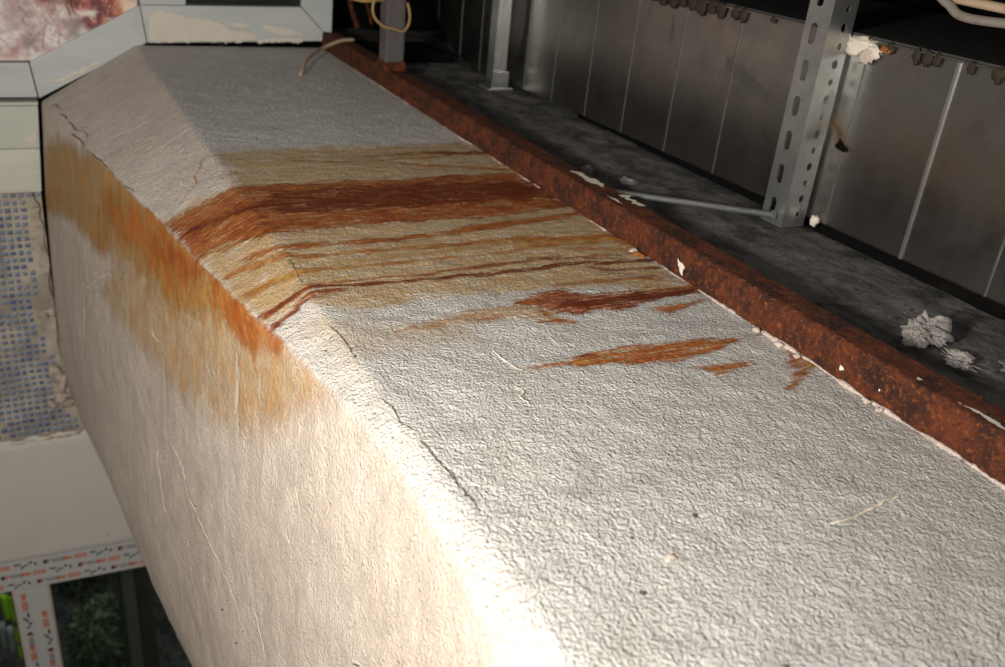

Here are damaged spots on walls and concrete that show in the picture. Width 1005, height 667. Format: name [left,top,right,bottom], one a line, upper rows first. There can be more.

peeling [147,9,303,44]
crack [52,104,106,166]
rust [165,143,700,331]
rust [533,338,754,375]
rust [785,350,816,390]